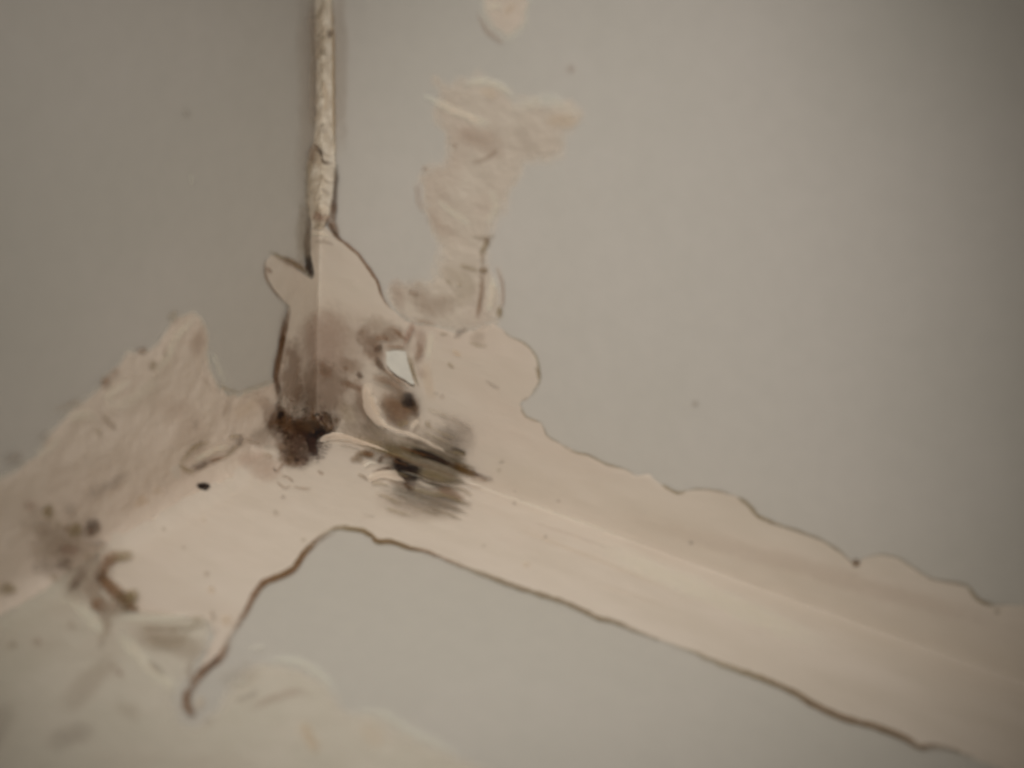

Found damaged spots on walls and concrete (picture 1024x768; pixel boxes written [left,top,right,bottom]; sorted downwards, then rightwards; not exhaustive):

crack [306,0,336,230]
leakage [277,406,332,465]
leakage [359,449,479,487]
peeling [98,227,1024,768]